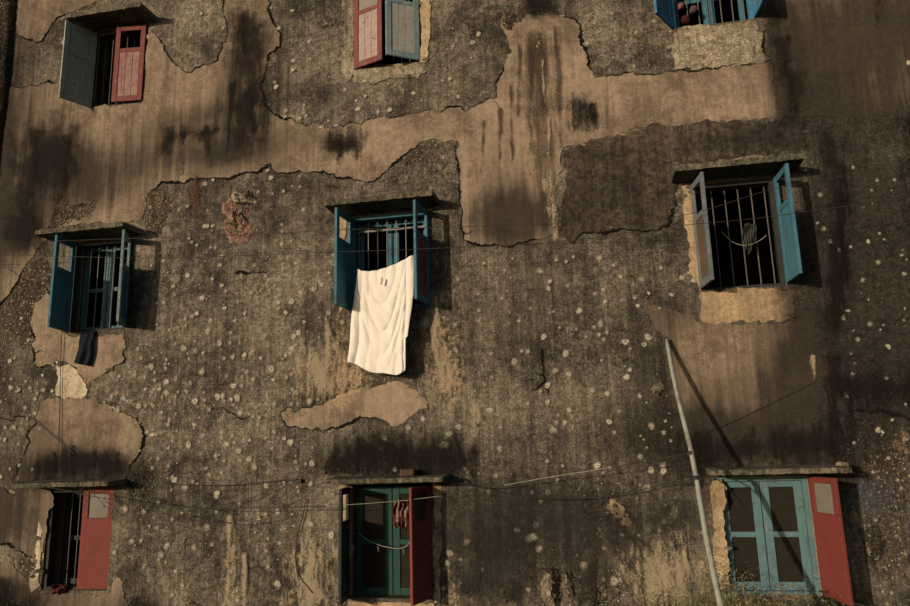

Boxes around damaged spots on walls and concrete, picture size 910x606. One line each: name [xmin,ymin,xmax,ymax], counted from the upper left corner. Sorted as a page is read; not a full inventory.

leakage [160,7,270,154]
leakage [498,28,598,240]
peeling [0,0,910,465]
leakage [818,132,856,339]
peeling [2,257,154,509]
leakage [827,354,910,450]
crack [845,401,910,420]
peeling [0,487,132,606]
crack [540,564,597,606]
leakage [620,533,708,606]